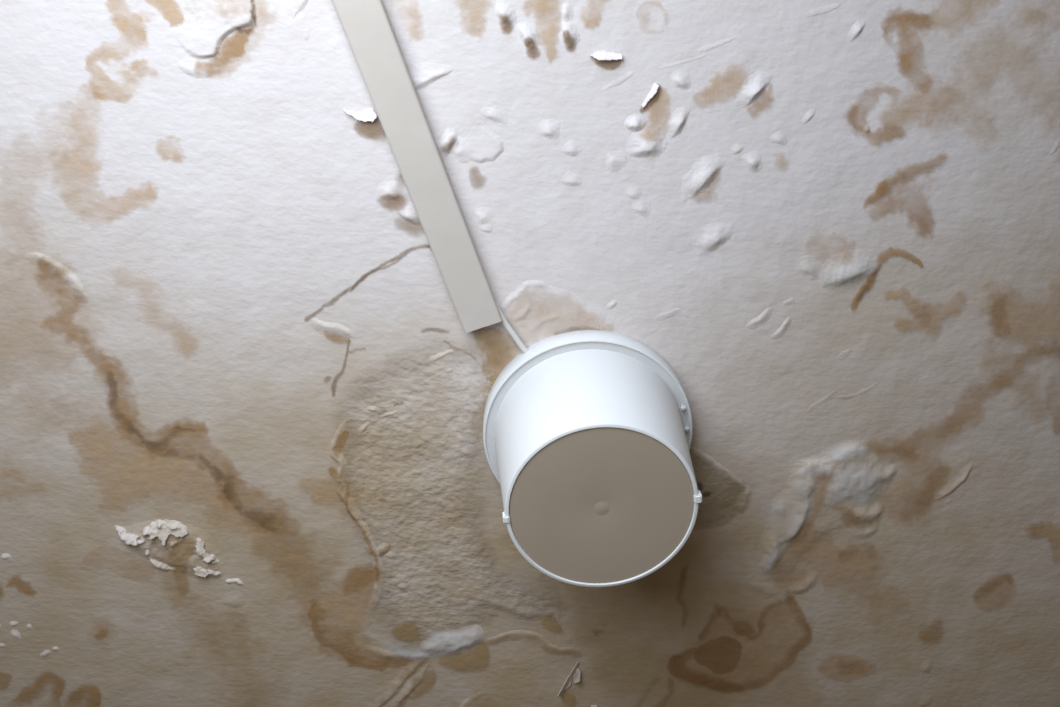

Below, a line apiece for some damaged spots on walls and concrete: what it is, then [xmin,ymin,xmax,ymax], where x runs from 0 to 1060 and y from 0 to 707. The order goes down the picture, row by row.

water stain [112,7,145,40]
water stain [150,0,183,25]
peeling [176,0,257,79]
water stain [222,34,247,62]
peeling [590,51,622,61]
water stain [898,15,928,73]
peeling [642,83,659,108]
peeling [343,108,377,122]
water stain [866,173,905,204]
water stain [80,402,282,531]
spalling [689,452,743,525]
water stain [20,674,100,707]